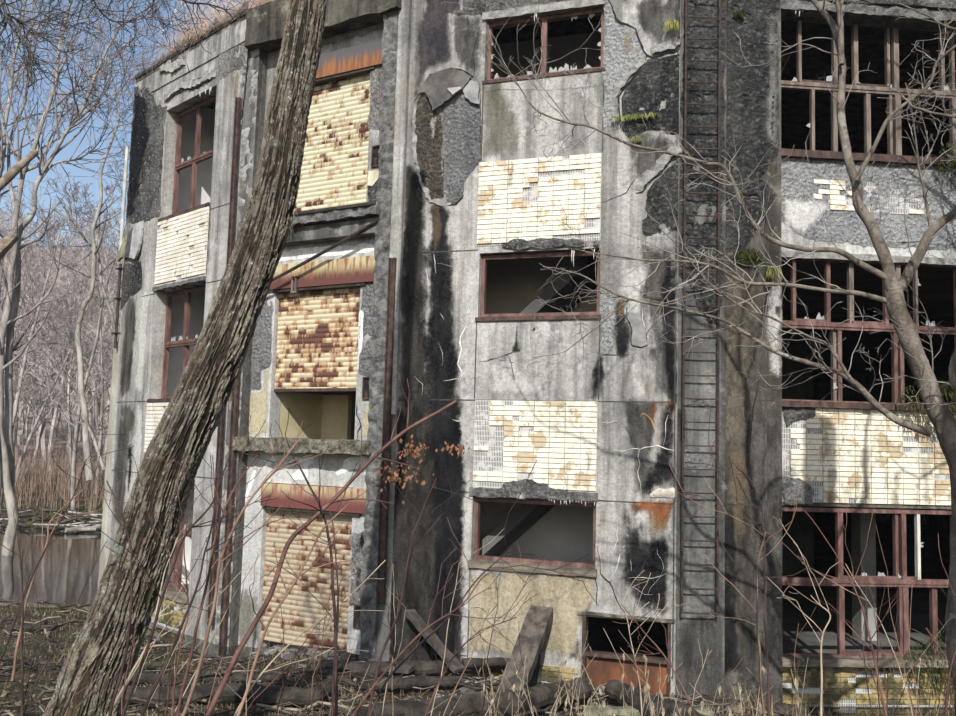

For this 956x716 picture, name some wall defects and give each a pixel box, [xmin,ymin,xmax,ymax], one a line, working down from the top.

flaking render [453,0,569,16]
flaking render [116,87,167,310]
flaking render [412,28,483,206]
spalling [502,238,599,250]
flaking render [601,0,956,325]
leakage [389,165,594,661]
spalling [784,407,816,426]
rust [632,501,674,528]
spalling [782,475,814,506]
leakage [624,515,669,613]